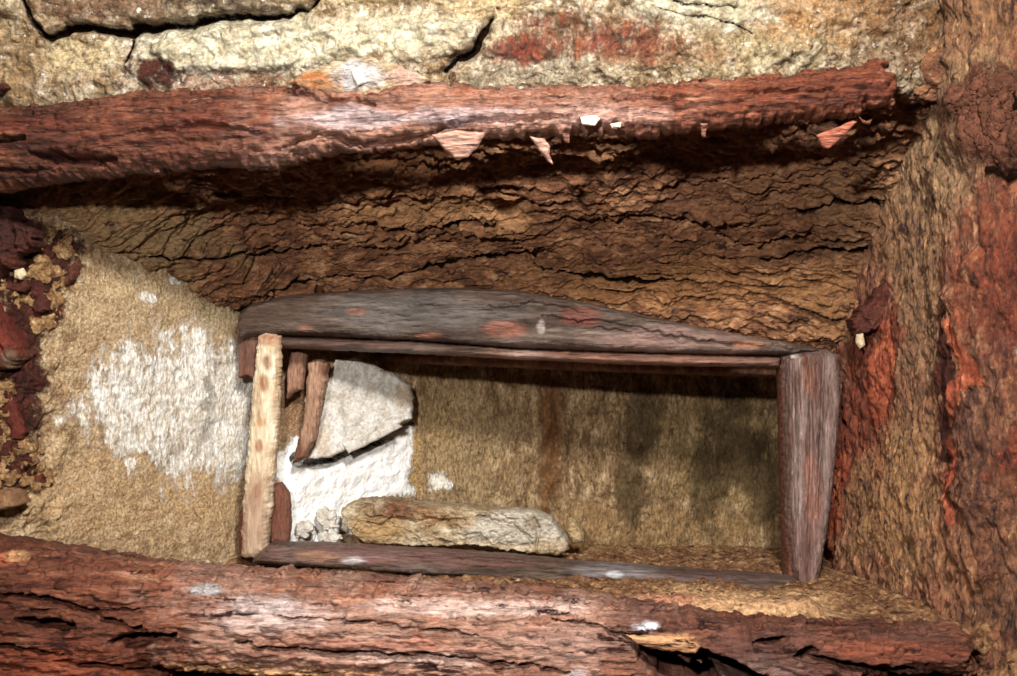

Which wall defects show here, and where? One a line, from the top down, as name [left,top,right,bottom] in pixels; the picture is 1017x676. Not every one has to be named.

crack [22,0,321,63]
crack [444,18,494,73]
water stain [139,291,157,304]
water stain [53,316,253,494]
water stain [616,381,664,526]